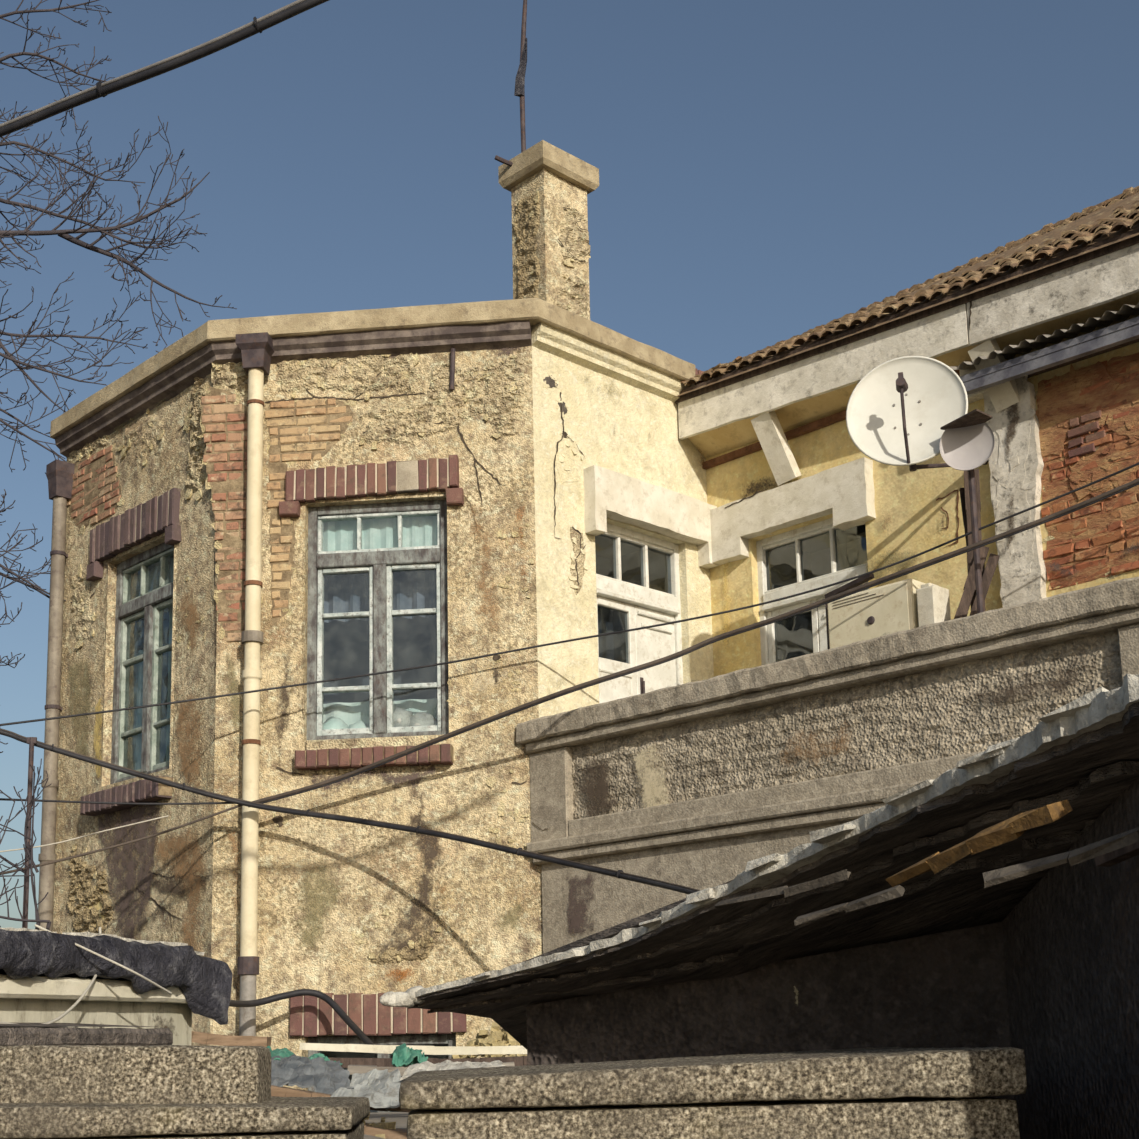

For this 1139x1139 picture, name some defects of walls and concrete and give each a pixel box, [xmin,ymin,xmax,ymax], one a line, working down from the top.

spalling [513,190,540,299]
spalling [556,204,591,319]
spalling [67,408,166,535]
spalling [182,362,248,642]
crack [265,370,503,543]
spalling [261,353,530,626]
crack [554,392,586,591]
spalling [992,352,1139,590]
spalling [66,844,115,934]
water stain [98,801,206,946]
water stain [312,765,441,953]
water stain [567,874,594,934]